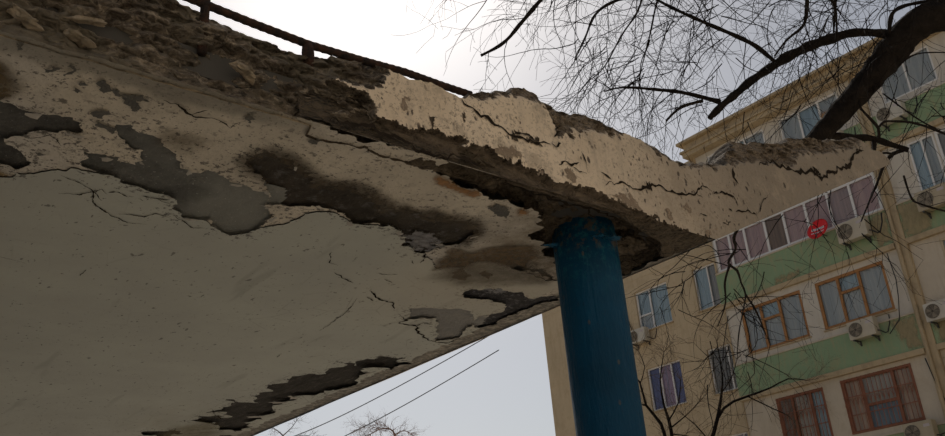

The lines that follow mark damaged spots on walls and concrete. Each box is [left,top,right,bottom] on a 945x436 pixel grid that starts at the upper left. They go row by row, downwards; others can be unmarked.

spalling [0,0,712,275]
crack [329,117,483,169]
crack [462,100,768,225]
crack [759,146,864,181]
crack [58,178,193,228]
water stain [240,150,545,283]
crack [503,182,662,257]
peeling [407,271,560,341]
peeling [141,356,411,436]